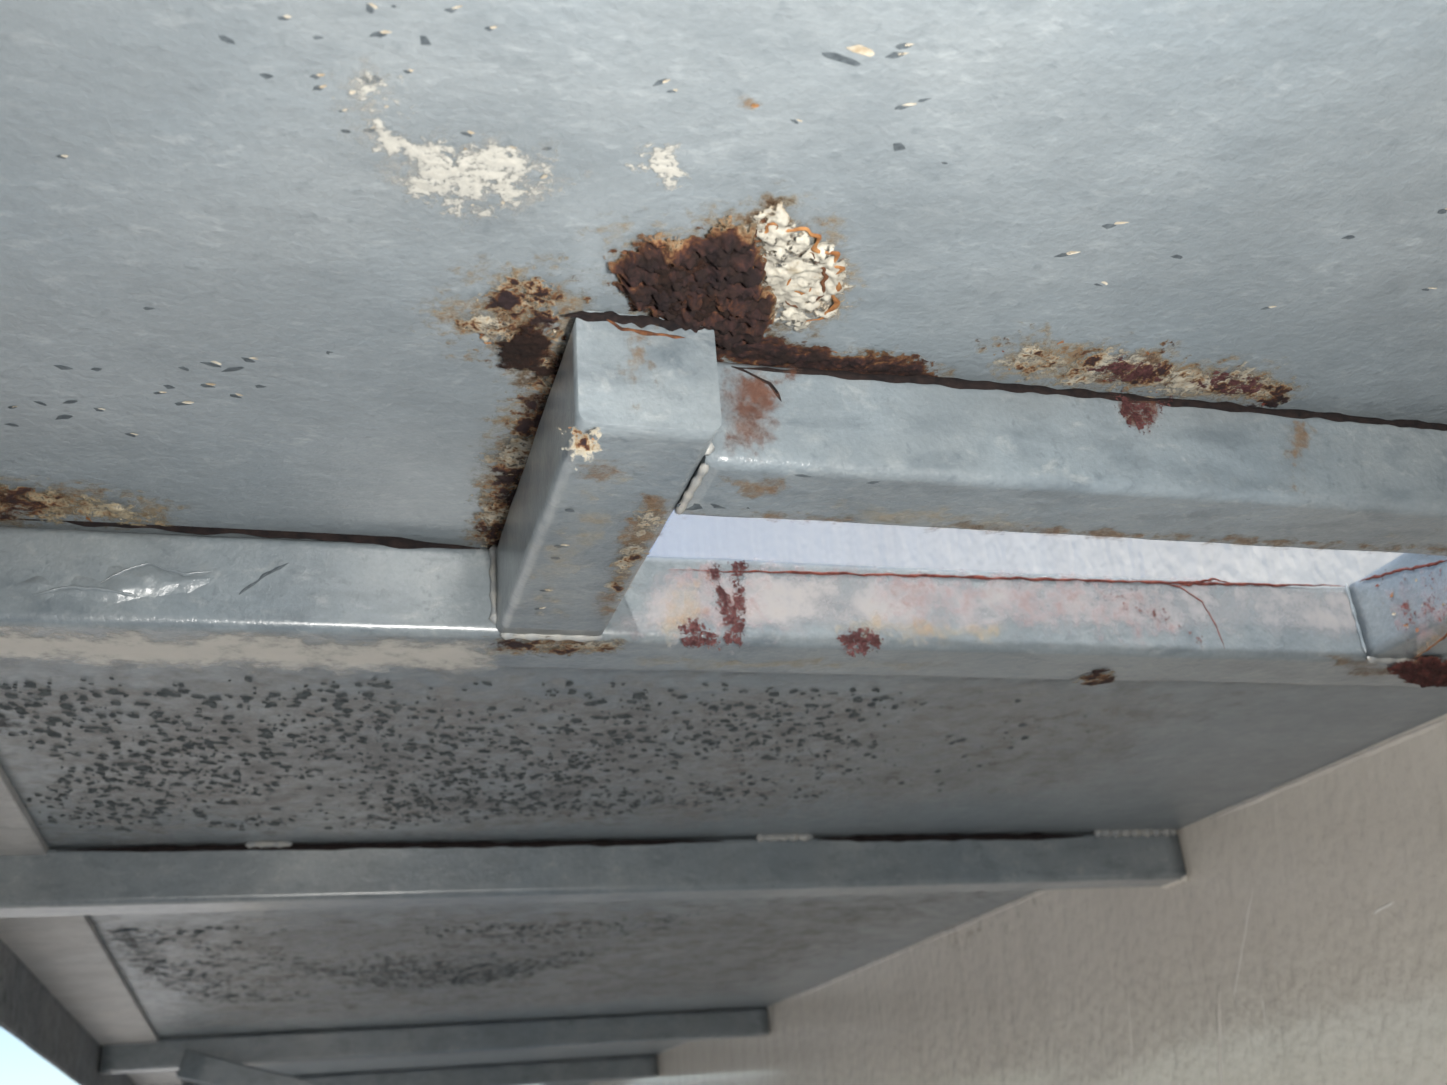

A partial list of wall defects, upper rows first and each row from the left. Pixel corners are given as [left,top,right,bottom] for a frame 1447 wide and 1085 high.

peeling [310,69,576,217]
peeling [626,144,687,191]
peeling [744,195,854,337]
corrosion [604,198,954,441]
corrosion [433,268,591,548]
corrosion [976,330,1299,435]
corrosion [0,482,182,527]
corrosion [1211,536,1340,549]
corrosion [836,627,884,663]
corrosion [675,548,1447,651]
corrosion [1071,669,1117,686]
corrosion [1333,633,1447,688]